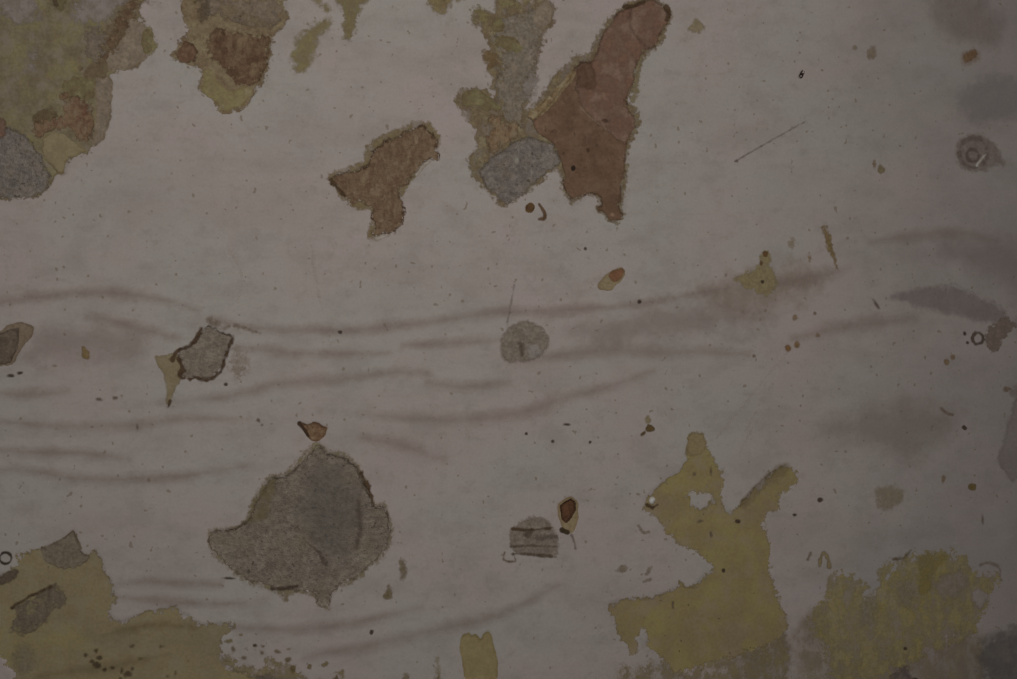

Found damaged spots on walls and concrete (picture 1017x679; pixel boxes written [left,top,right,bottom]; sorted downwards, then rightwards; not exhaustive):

peeling [0,0,158,201]
flaking render [170,0,289,114]
flaking render [328,121,440,240]
flaking render [428,0,458,14]
flaking render [454,0,672,225]
flaking render [155,325,233,407]
peeling [0,530,344,679]
flaking render [208,421,392,608]
peeling [460,631,498,679]
peeling [608,432,798,679]